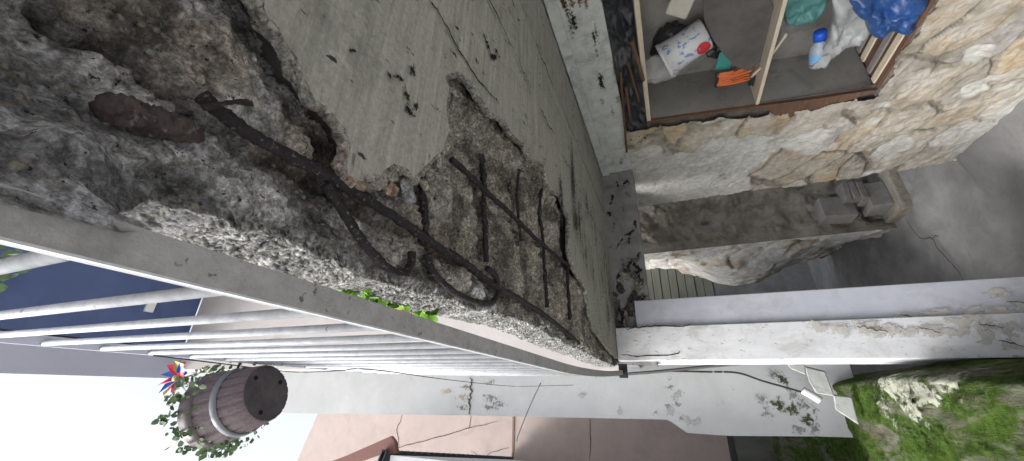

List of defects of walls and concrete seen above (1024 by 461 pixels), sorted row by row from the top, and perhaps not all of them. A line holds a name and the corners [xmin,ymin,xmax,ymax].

spalling [0,0,618,367]
crack [906,219,964,280]
spalling [613,262,651,328]
peeling [807,287,1024,349]
crack [396,378,507,455]
damp [756,373,819,437]